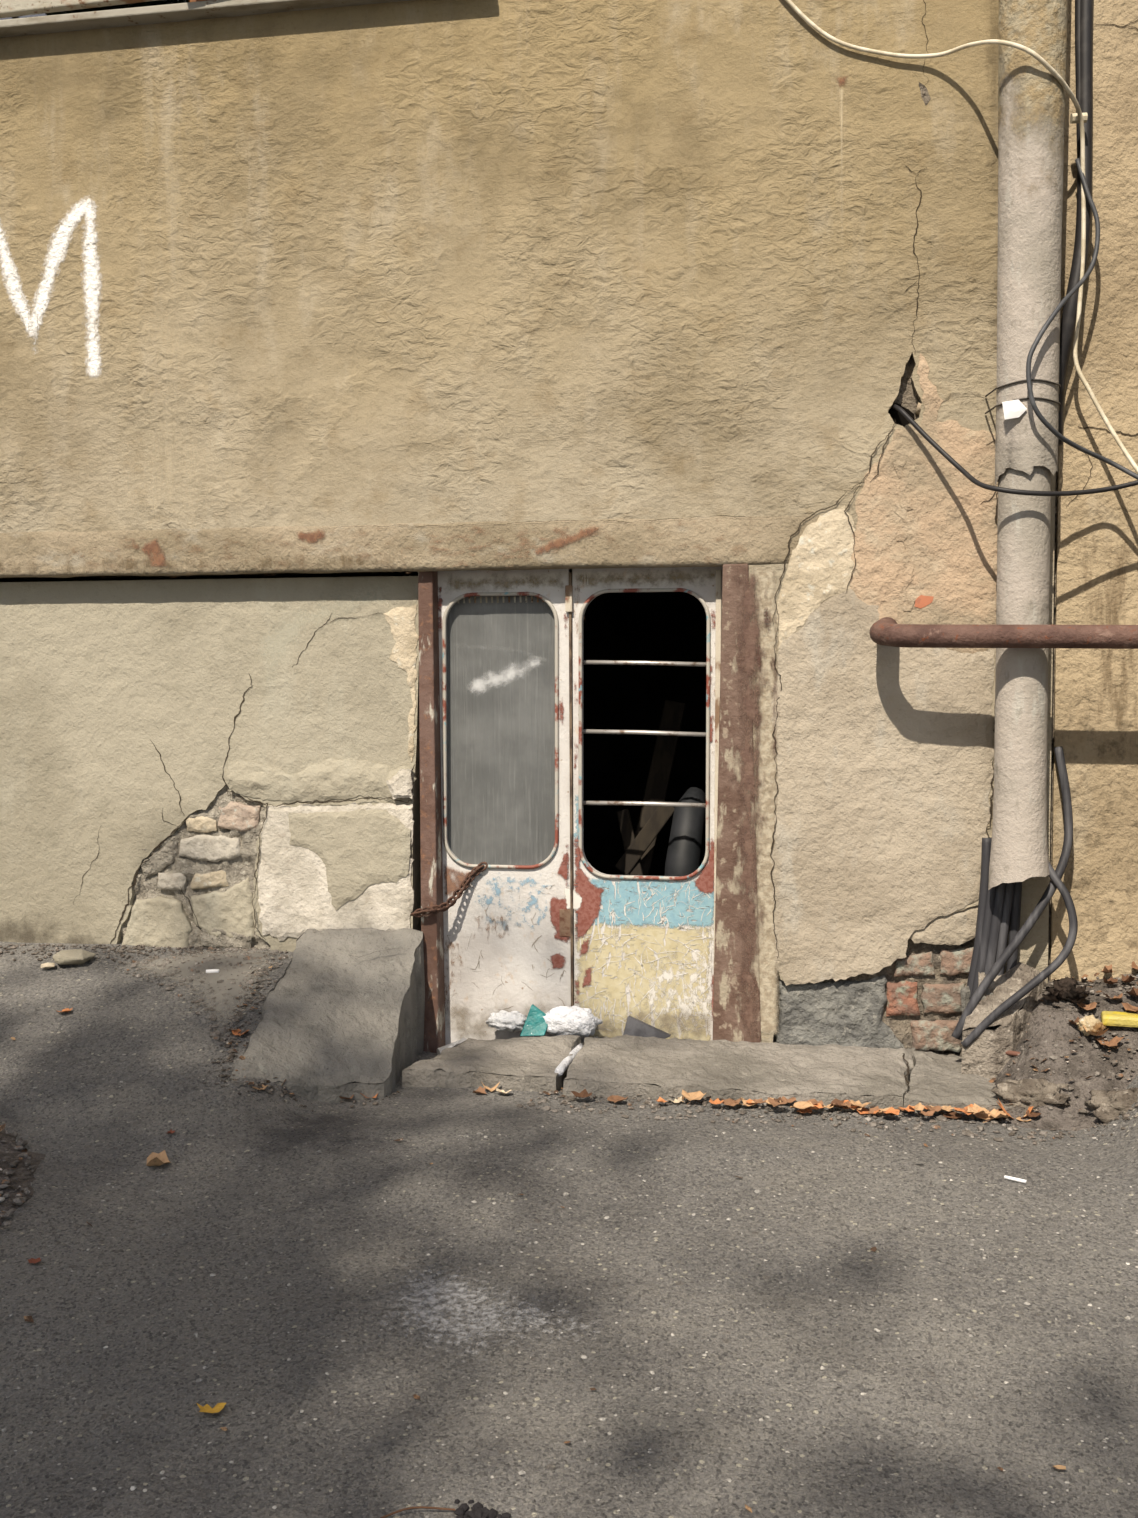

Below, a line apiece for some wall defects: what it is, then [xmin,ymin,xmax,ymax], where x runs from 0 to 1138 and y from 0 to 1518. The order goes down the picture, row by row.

crack [921,0,929,100]
crack [904,165,926,349]
crack [292,613,377,667]
crack [110,741,188,944]
flaking render [120,604,419,950]
crack [222,674,412,940]
peeling [564,888,582,910]
spalling [731,505,1045,1079]